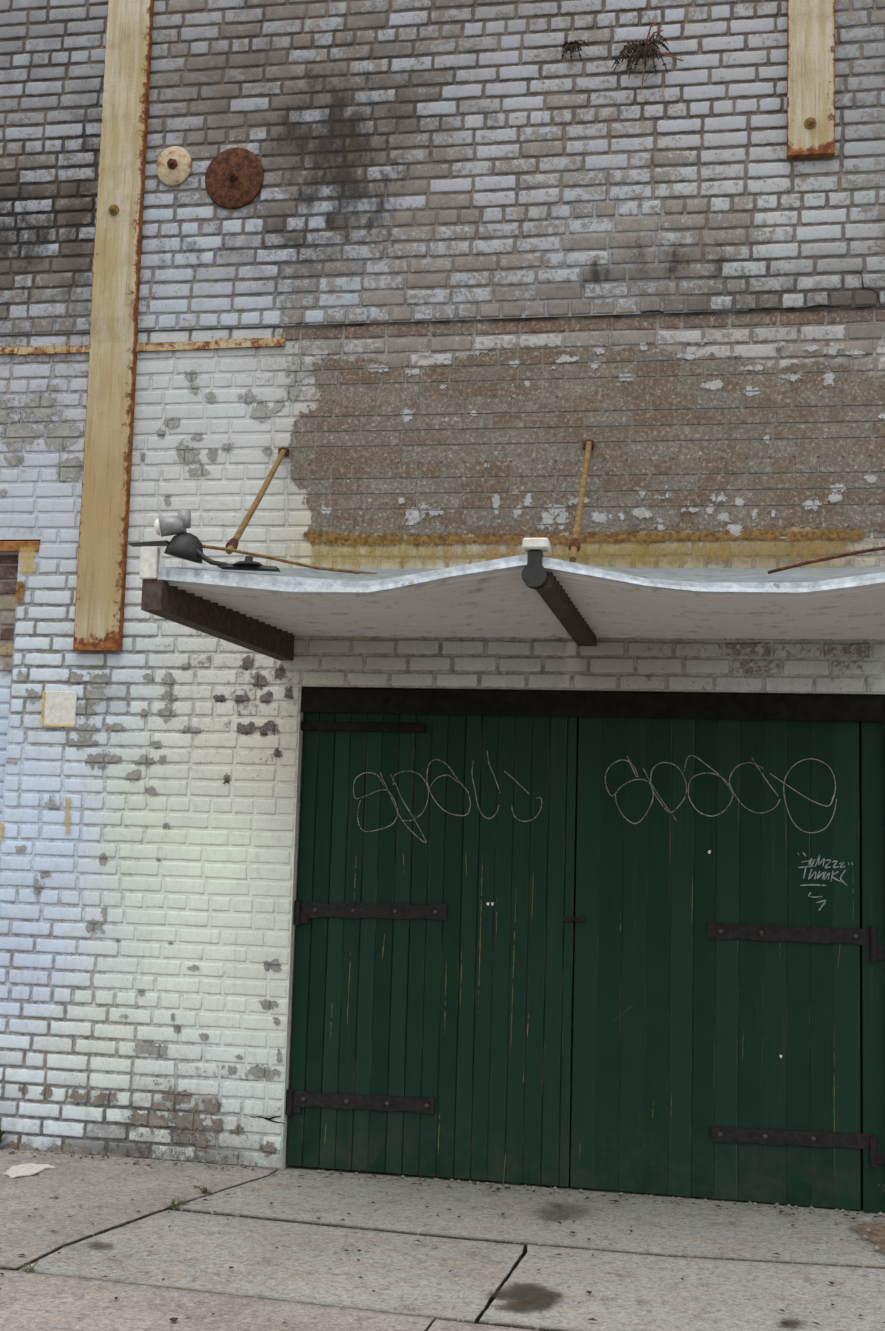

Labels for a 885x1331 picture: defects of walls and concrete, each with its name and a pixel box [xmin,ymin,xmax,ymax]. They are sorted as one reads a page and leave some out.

damp [277,70,405,237]
crack [288,270,881,326]
peeling [184,369,218,402]
peeling [157,417,234,477]
peeling [236,335,885,541]
peeling [17,670,40,703]
peeling [140,662,201,736]
peeling [212,655,294,706]
peeling [65,667,166,795]
peeling [236,720,283,759]
spalling [835,1219,885,1252]